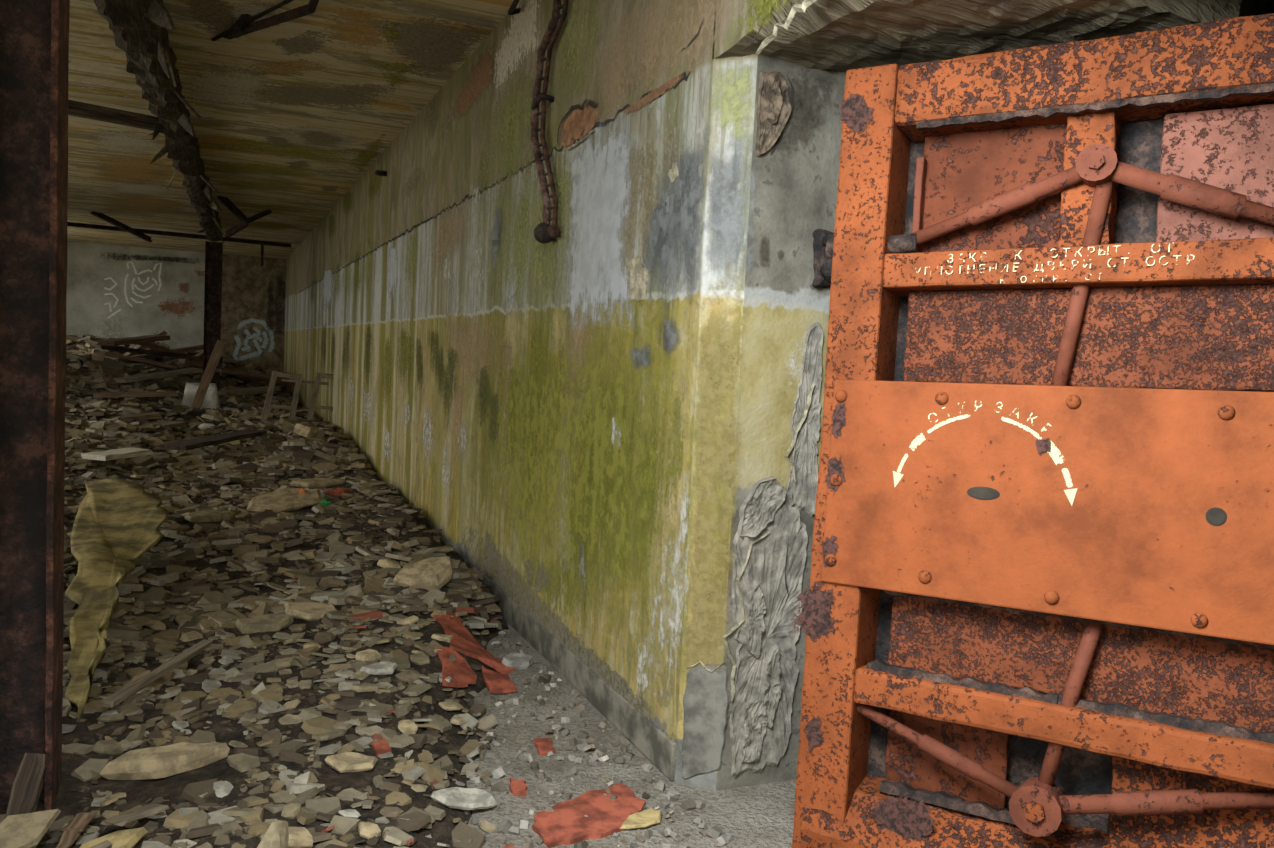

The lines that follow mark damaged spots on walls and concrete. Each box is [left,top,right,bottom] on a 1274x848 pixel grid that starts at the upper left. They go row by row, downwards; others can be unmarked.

flaking render [557,99,598,150]
peeling [625,75,683,114]
corrosion [838,94,874,134]
corrosion [916,83,1274,130]
leakage [384,405,467,491]
corrosion [1036,438,1051,455]
peeling [722,322,823,779]
leakage [637,490,690,692]
corrosion [793,580,836,642]
corrosion [885,590,1274,649]
corrosion [866,660,1274,744]
corrosion [863,779,1015,844]